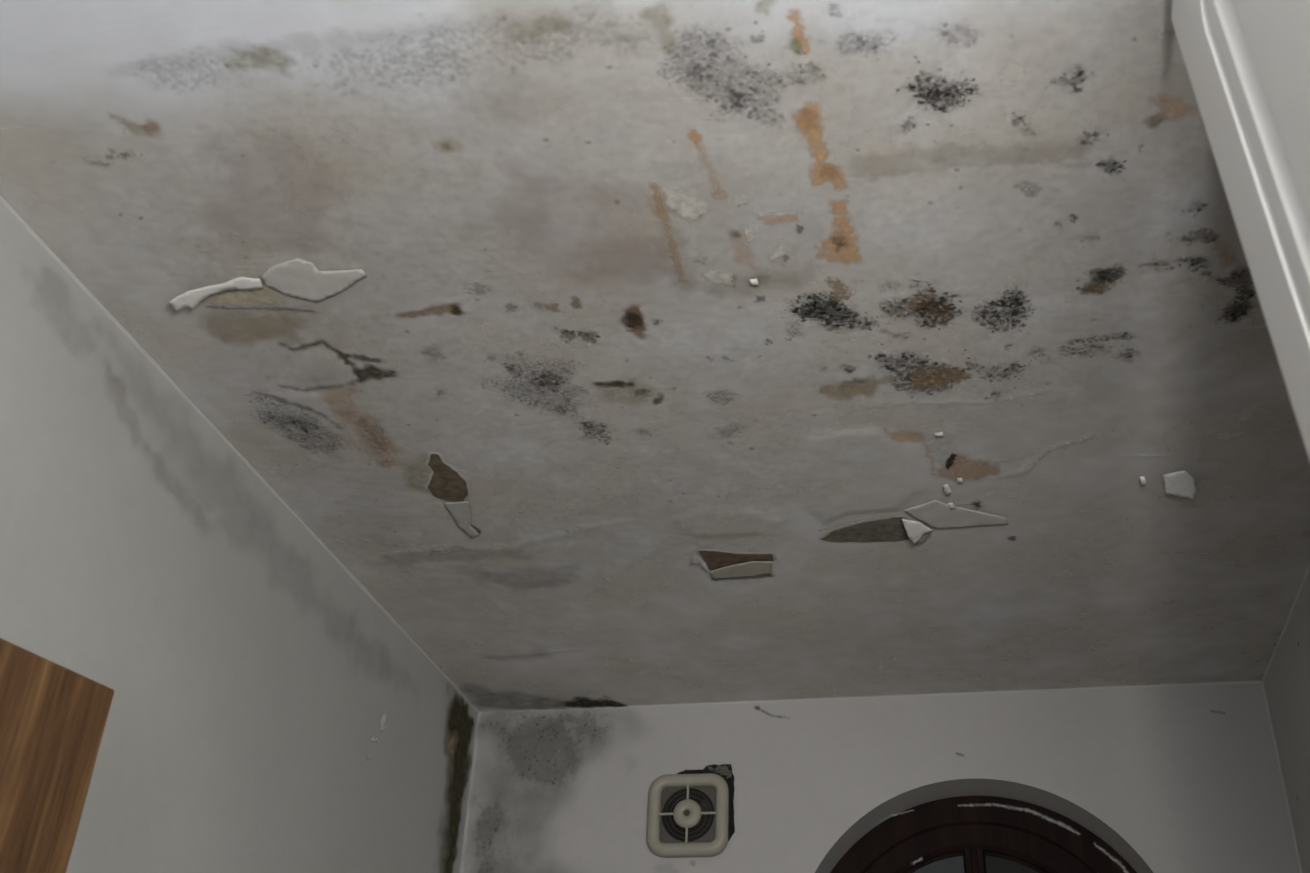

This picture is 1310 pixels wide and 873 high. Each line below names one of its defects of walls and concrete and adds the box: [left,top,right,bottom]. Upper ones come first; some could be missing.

damp [789,11,808,53]
corrosion [794,105,860,263]
peeling [169,258,368,312]
damp [793,280,853,325]
damp [1246,282,1259,302]
crack [290,341,394,381]
spalling [425,452,480,538]
spalling [818,432,1015,544]
peeling [1163,471,1196,499]
spalling [692,549,776,579]
damp [565,697,626,708]
damp [443,698,474,873]